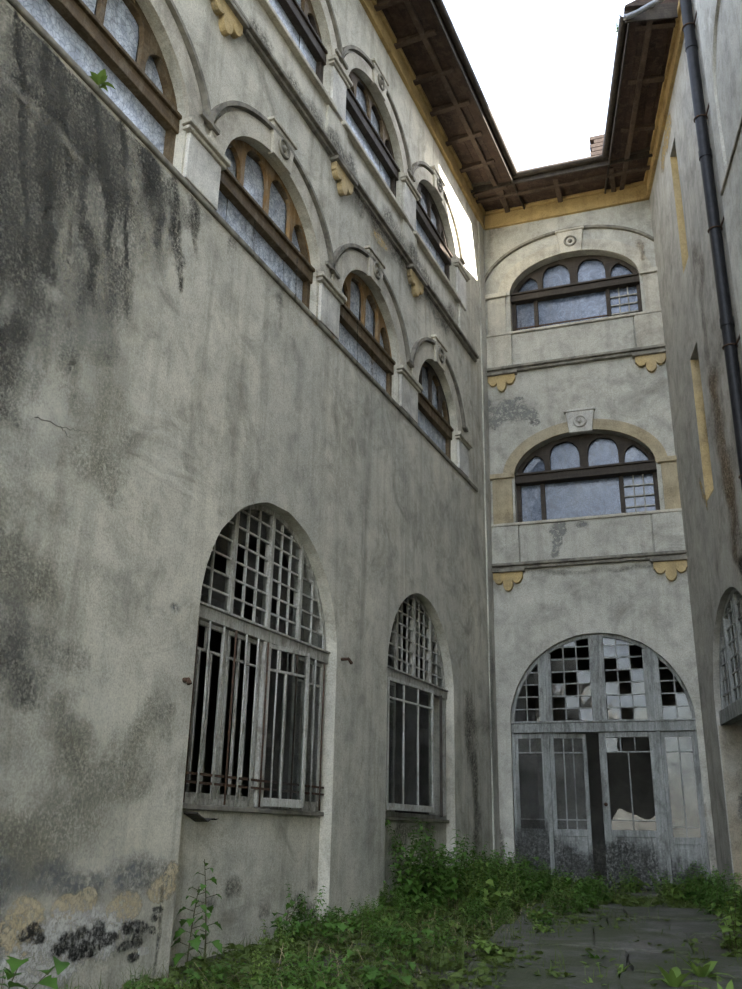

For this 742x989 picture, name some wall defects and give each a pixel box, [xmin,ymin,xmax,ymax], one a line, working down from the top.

water stain [0,6,200,427]
water stain [165,0,468,433]
peeling [488,397,540,430]
water stain [0,616,45,705]
water stain [0,727,168,975]
spalling [0,862,179,989]